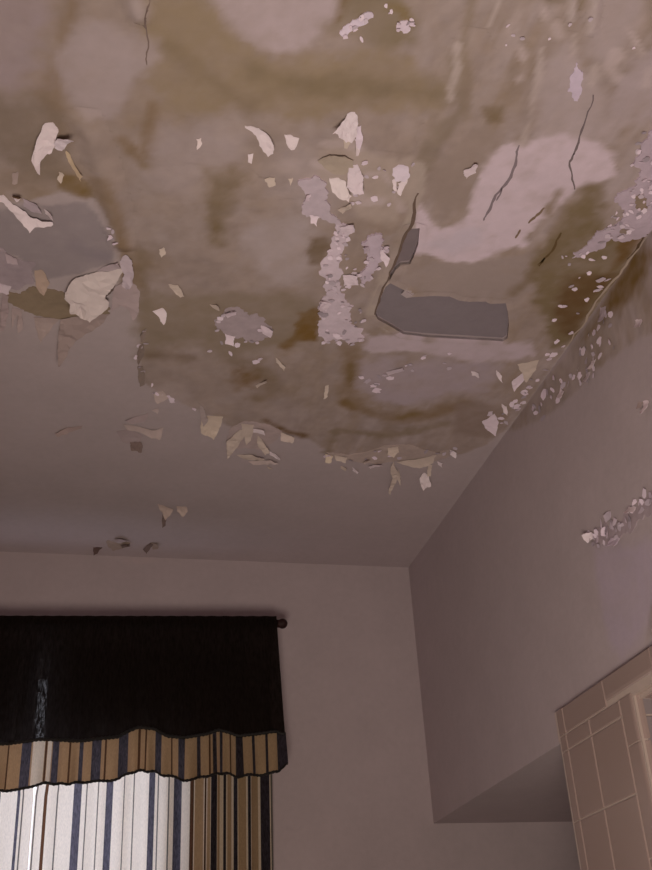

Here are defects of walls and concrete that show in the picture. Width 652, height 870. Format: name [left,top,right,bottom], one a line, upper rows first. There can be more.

crack [136,0,150,65]
peeling [339,11,374,43]
peeling [0,195,53,233]
peeling [31,122,83,183]
peeling [245,126,274,164]
water stain [0,0,652,461]
flaking render [288,112,516,370]
crack [483,145,520,221]
crack [569,95,594,190]
peeling [561,130,652,302]
peeling [0,248,140,367]
peeling [210,304,273,356]